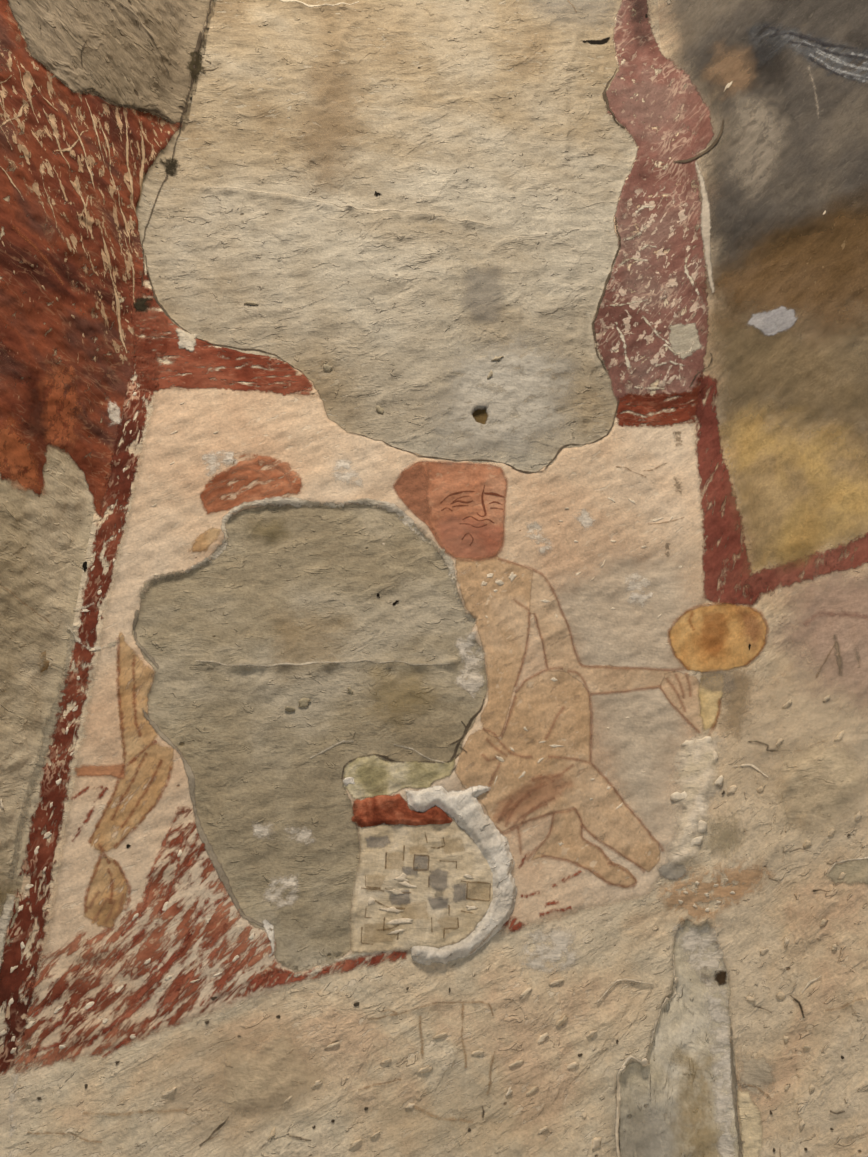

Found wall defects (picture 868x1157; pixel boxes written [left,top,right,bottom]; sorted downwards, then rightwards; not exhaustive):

flaking render [0,0,213,364]
crack [80,0,301,371]
spalling [748,306,797,336]
peeling [42,366,80,446]
peeling [0,419,42,491]
peeling [67,625,117,651]
flaking render [343,755,455,828]
peeling [0,1021,35,1054]
spalling [615,861,790,1157]